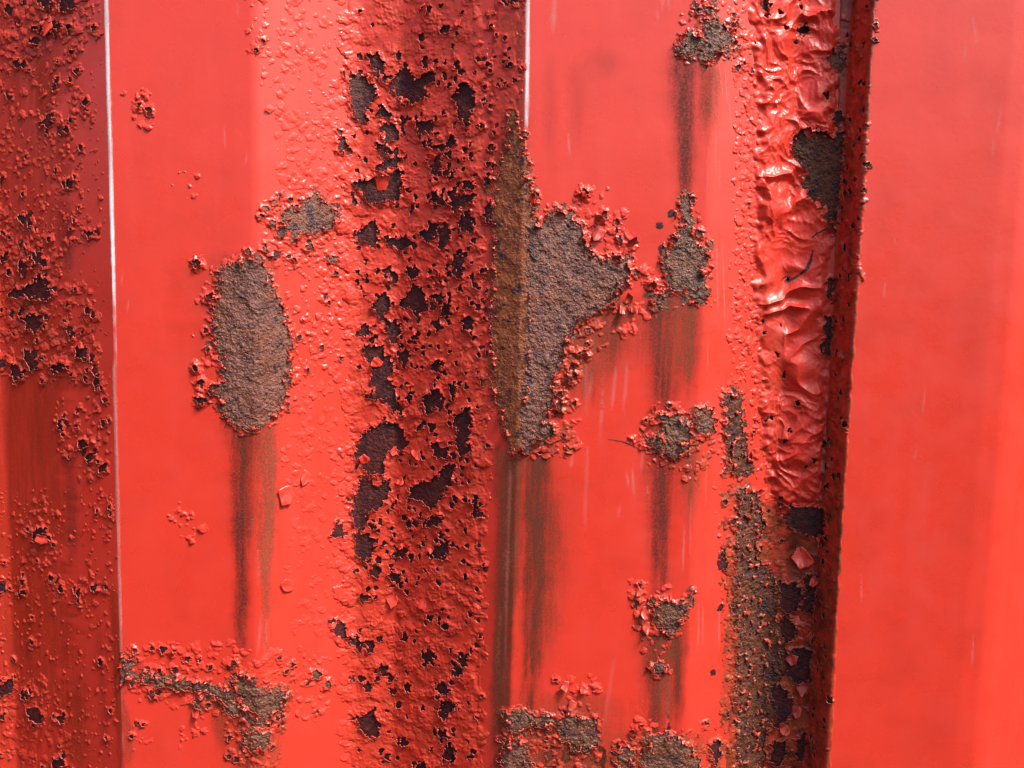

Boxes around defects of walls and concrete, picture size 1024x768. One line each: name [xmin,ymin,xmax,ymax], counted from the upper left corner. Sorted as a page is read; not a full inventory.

peeling [0,0,123,768]
rust [111,244,340,768]
rust [258,188,341,251]
peeling [327,0,527,768]
rust [480,0,826,768]